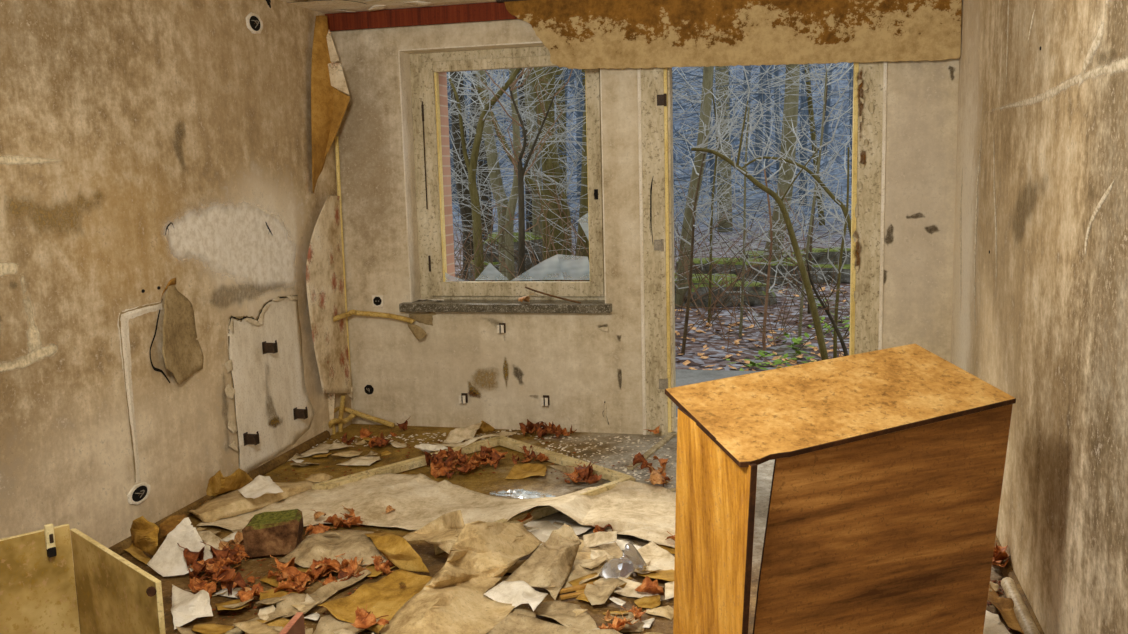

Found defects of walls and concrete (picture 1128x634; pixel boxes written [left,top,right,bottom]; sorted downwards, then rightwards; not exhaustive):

peeling [165,204,314,473]